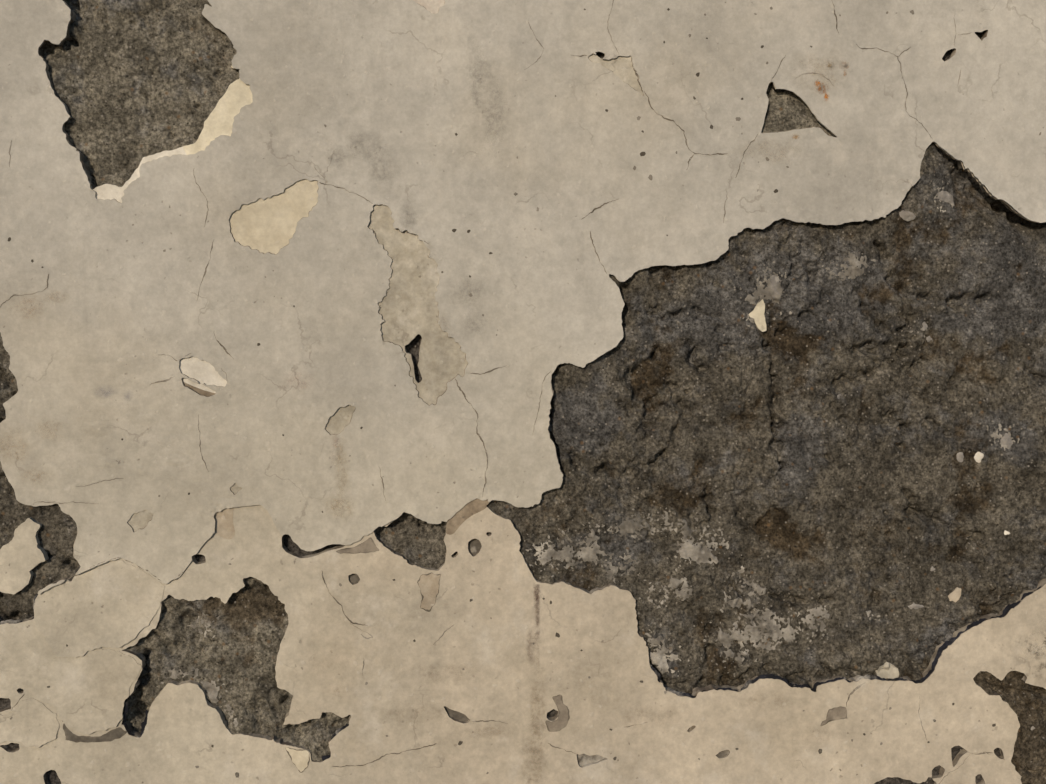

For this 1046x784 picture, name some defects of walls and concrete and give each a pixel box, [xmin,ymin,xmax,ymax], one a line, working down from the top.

spalling [38,0,253,203]
crack [607,0,758,223]
spalling [761,82,836,137]
crack [832,2,932,138]
peeling [229,179,319,255]
spalling [0,333,18,423]
spalling [282,142,1046,698]
spalling [0,461,81,625]
spalling [43,770,61,784]
spalling [62,577,351,773]
spalling [973,671,1046,784]